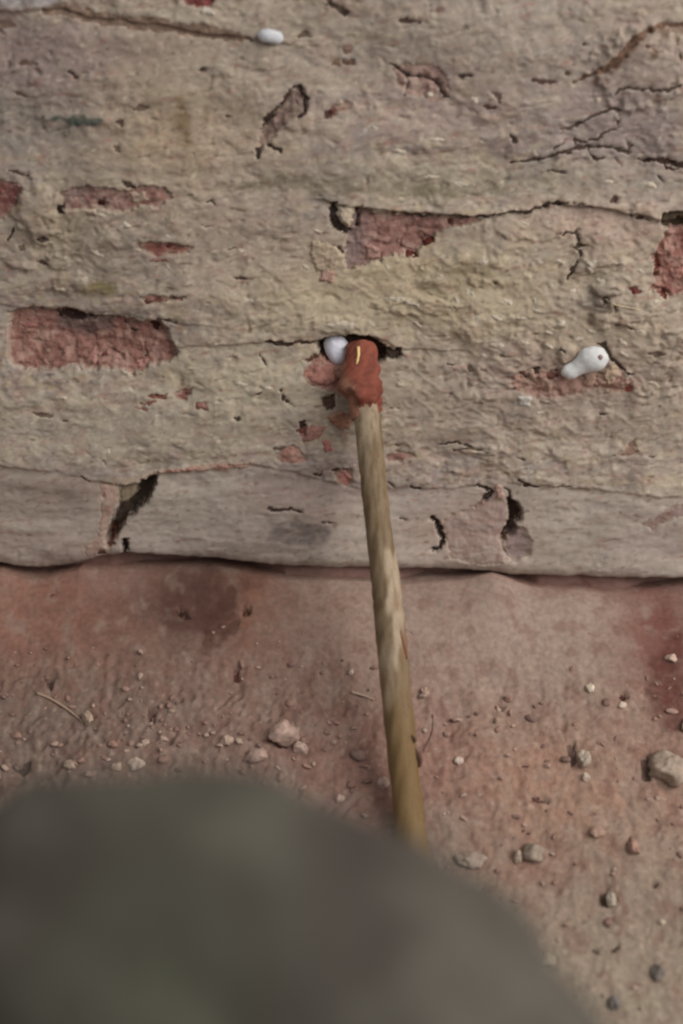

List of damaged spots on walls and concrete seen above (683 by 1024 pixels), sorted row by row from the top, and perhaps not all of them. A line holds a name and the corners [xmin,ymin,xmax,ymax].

spalling [255,84,311,160]
crack [509,22,683,174]
spalling [302,201,493,283]
crack [392,200,593,280]
crack [628,213,651,221]
spalling [614,211,683,306]
spalling [8,305,180,375]
crack [255,388,293,406]
crack [259,339,318,366]
spalling [273,321,403,464]
spalling [507,260,646,415]
spalling [443,484,510,565]